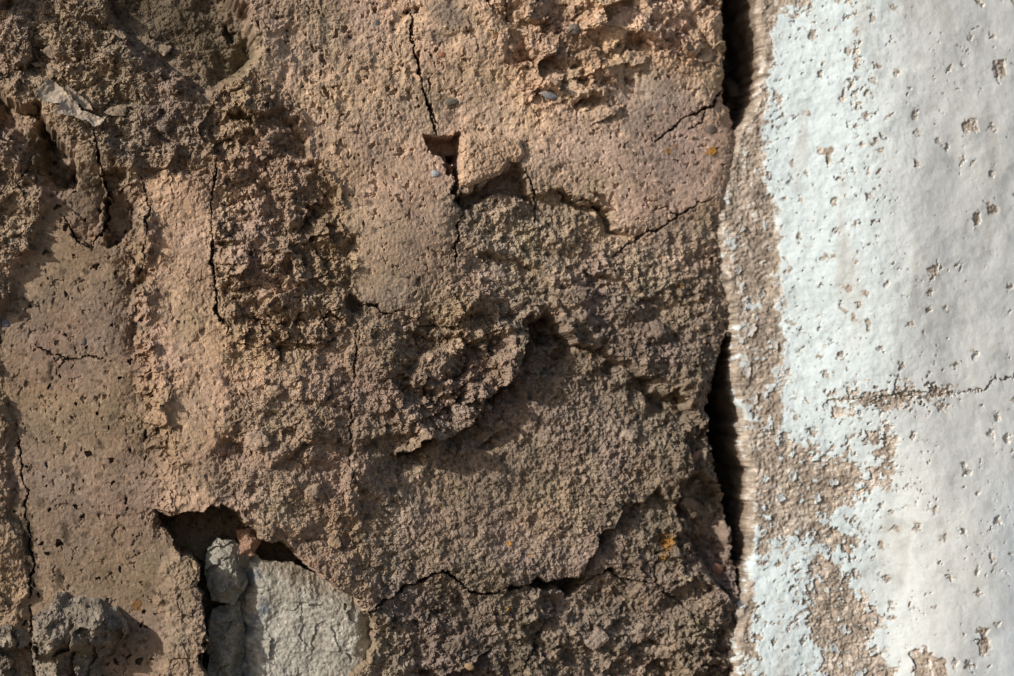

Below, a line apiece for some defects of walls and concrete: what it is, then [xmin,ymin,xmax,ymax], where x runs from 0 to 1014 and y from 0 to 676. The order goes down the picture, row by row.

crack [406,11,439,137]
crack [654,88,724,143]
crack [453,189,465,264]
crack [525,168,537,223]
crack [561,191,715,258]
spalling [220,0,1014,676]
crack [822,374,1014,409]
crack [17,435,30,527]
crack [28,552,36,673]
crack [366,569,528,614]
crack [522,617,552,676]
crack [576,551,703,620]